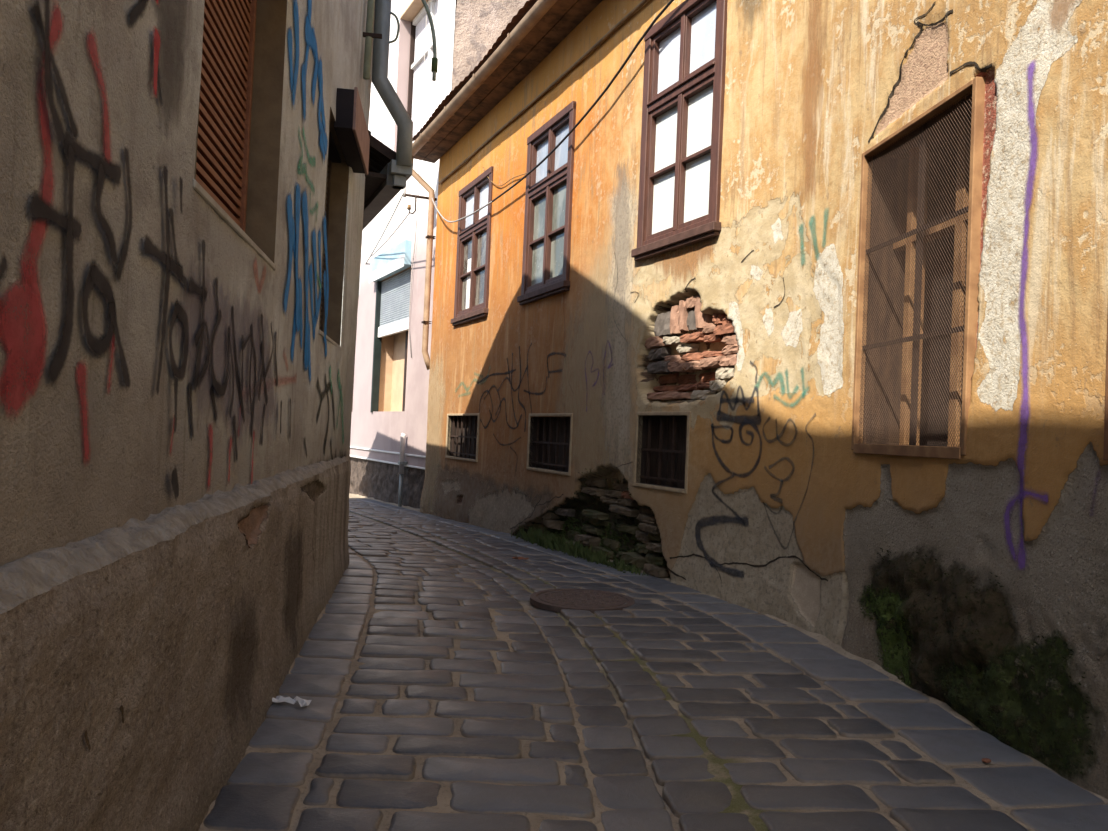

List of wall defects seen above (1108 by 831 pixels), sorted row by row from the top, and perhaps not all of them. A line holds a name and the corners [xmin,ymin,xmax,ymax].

spalling [875,22,949,136]
peeling [631,192,844,430]
peeling [971,0,1082,411]
spalling [300,479,325,501]
spalling [442,442,1108,799]